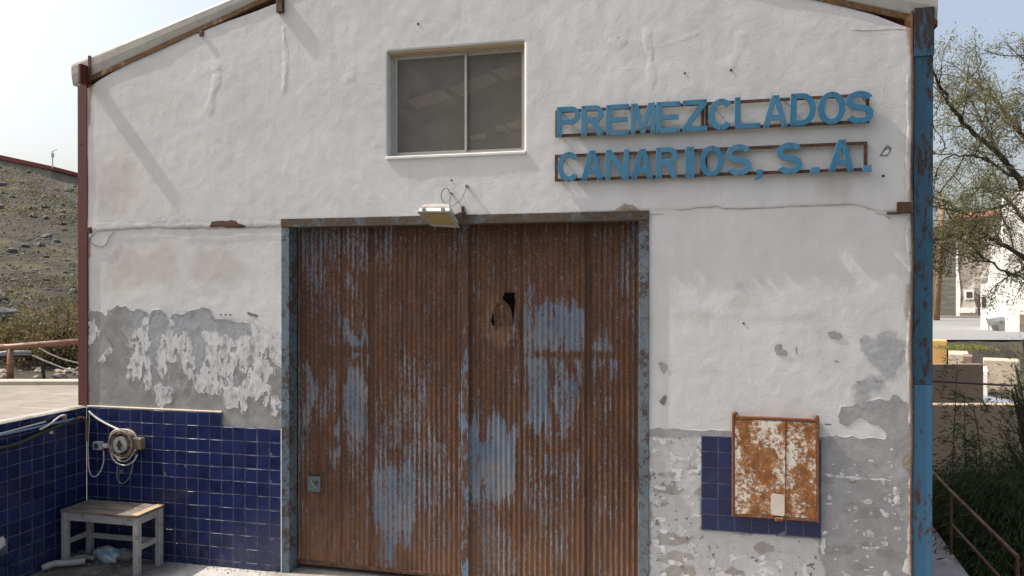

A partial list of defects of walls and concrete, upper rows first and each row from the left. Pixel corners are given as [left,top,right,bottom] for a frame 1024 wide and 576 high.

peeling [88,303,281,429]
peeling [649,75,911,576]